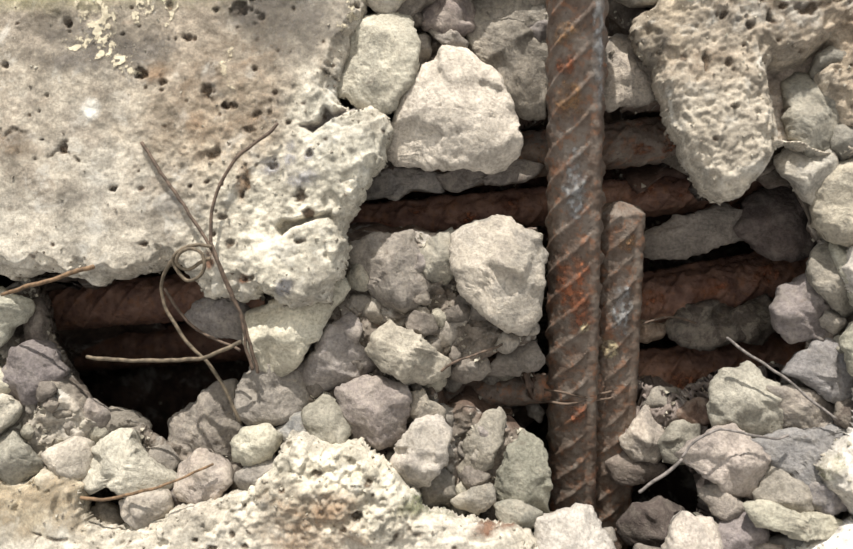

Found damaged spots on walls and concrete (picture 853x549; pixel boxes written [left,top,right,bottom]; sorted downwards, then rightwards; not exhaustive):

peeling [65,0,148,79]
leakage [39,26,174,69]
peeling [131,0,179,27]
peeling [219,47,235,89]
spalling [241,0,853,549]
spalling [0,262,253,473]
spalling [73,478,132,533]
spalling [151,429,539,549]